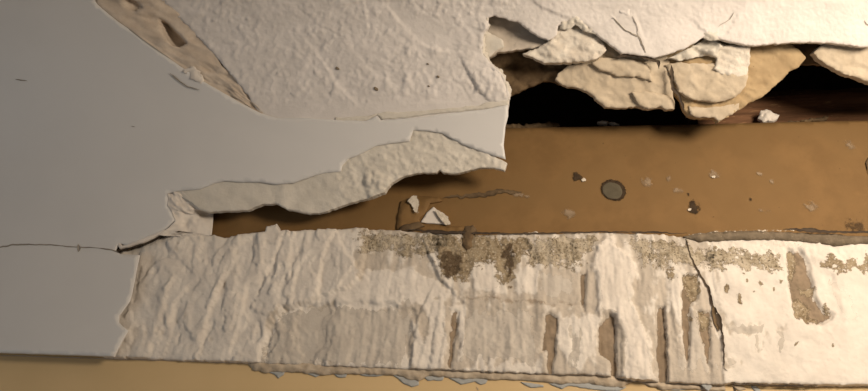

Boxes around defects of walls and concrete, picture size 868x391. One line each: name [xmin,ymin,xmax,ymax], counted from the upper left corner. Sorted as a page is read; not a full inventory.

spalling [162,0,868,121]
crack [0,230,188,253]
spalling [104,130,868,391]
crack [405,229,816,391]
leakage [666,267,712,334]